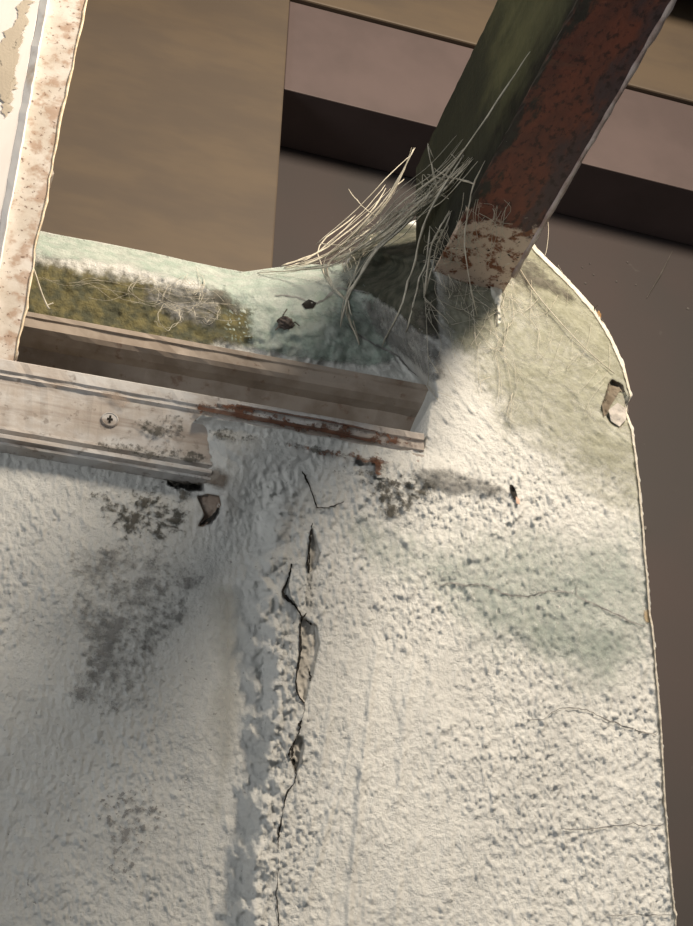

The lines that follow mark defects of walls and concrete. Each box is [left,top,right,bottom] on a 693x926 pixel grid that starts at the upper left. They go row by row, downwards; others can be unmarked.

peeling [0,0,35,116]
corrosion [198,403,411,444]
corrosion [289,443,384,475]
damp [359,469,501,518]
damp [75,469,227,701]
crack [436,582,645,626]
crack [275,471,344,926]
crack [528,707,656,735]
crack [561,822,664,830]